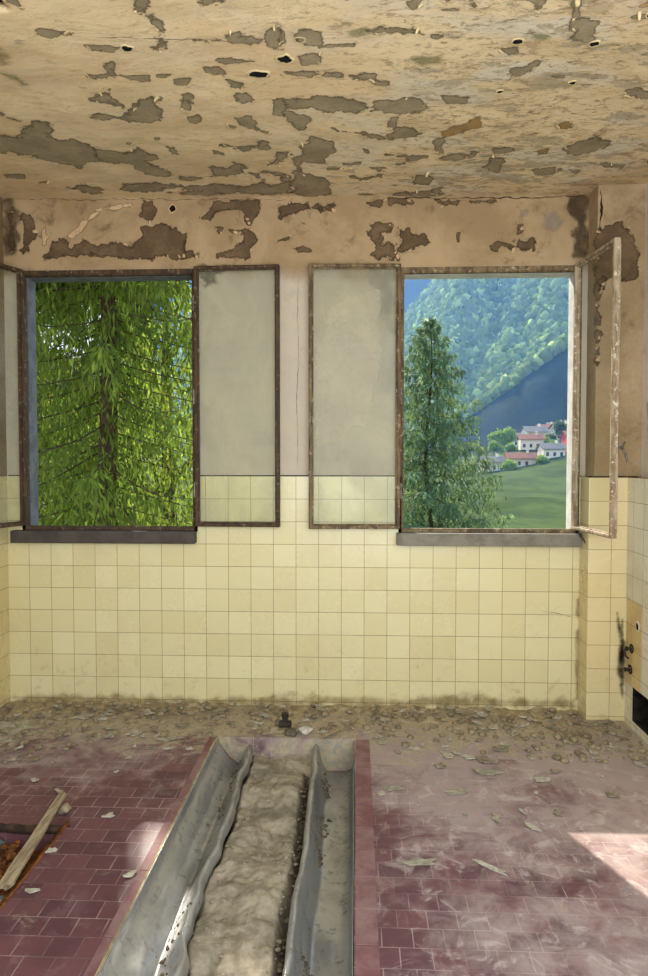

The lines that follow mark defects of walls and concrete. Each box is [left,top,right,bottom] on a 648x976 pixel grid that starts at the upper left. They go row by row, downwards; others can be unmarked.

peeling [133,0,168,52]
peeling [512,0,547,10]
peeling [568,0,601,48]
peeling [631,1,648,20]
peeling [0,25,515,262]
peeling [562,134,611,156]
peeling [529,148,581,176]